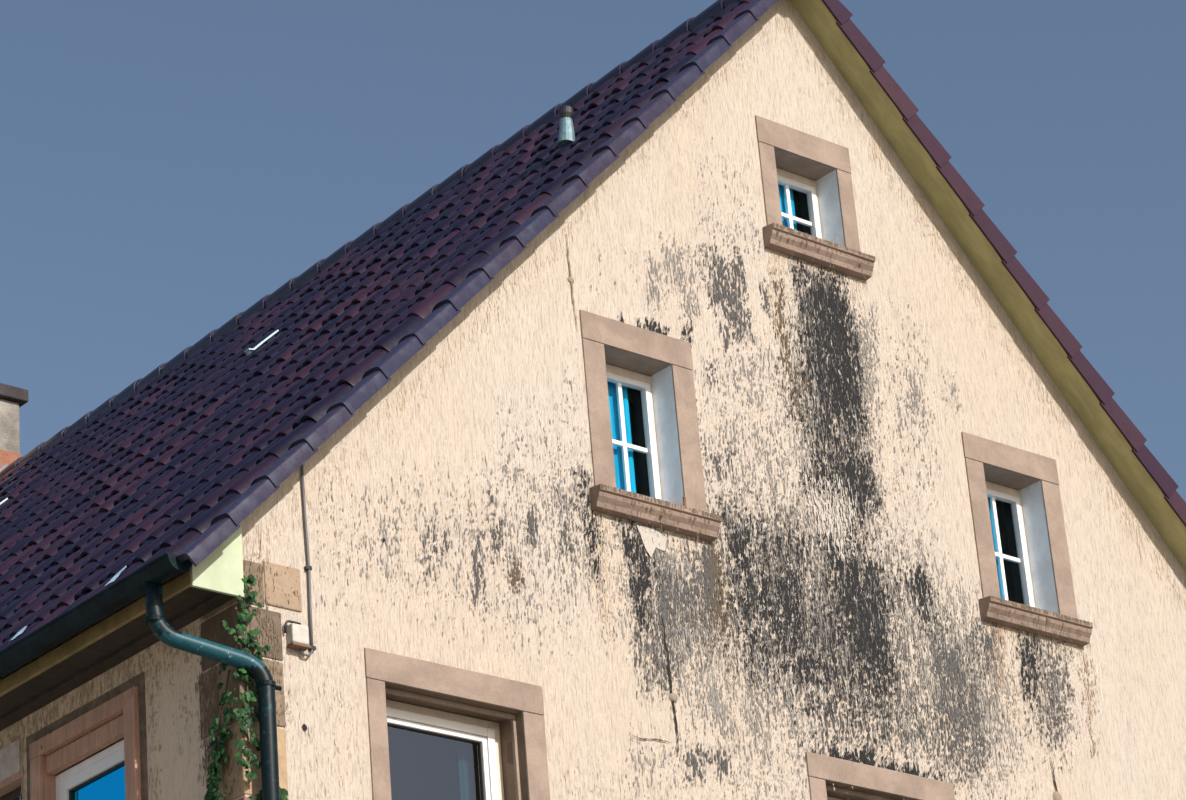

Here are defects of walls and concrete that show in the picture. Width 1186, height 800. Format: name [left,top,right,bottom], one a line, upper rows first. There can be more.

leakage [178,0,1092,800]
crack [633,618,679,756]